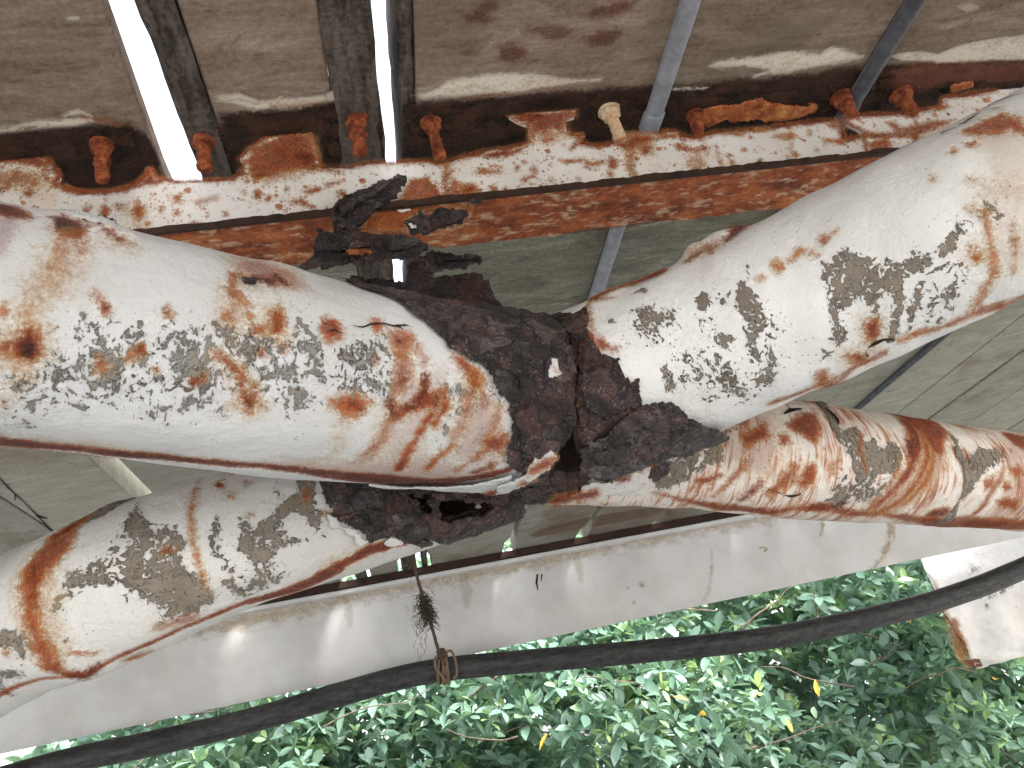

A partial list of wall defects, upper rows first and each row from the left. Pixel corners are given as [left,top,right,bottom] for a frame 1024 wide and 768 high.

corrosion [0,59,1024,358]
corrosion [0,301,47,378]
corrosion [186,481,208,583]
corrosion [0,318,512,498]
peeling [0,275,747,624]
peeling [629,265,792,405]
corrosion [657,412,1024,530]
peeling [814,401,904,509]
peeling [820,199,1004,361]
peeling [926,430,1006,525]
corrosion [0,516,411,697]